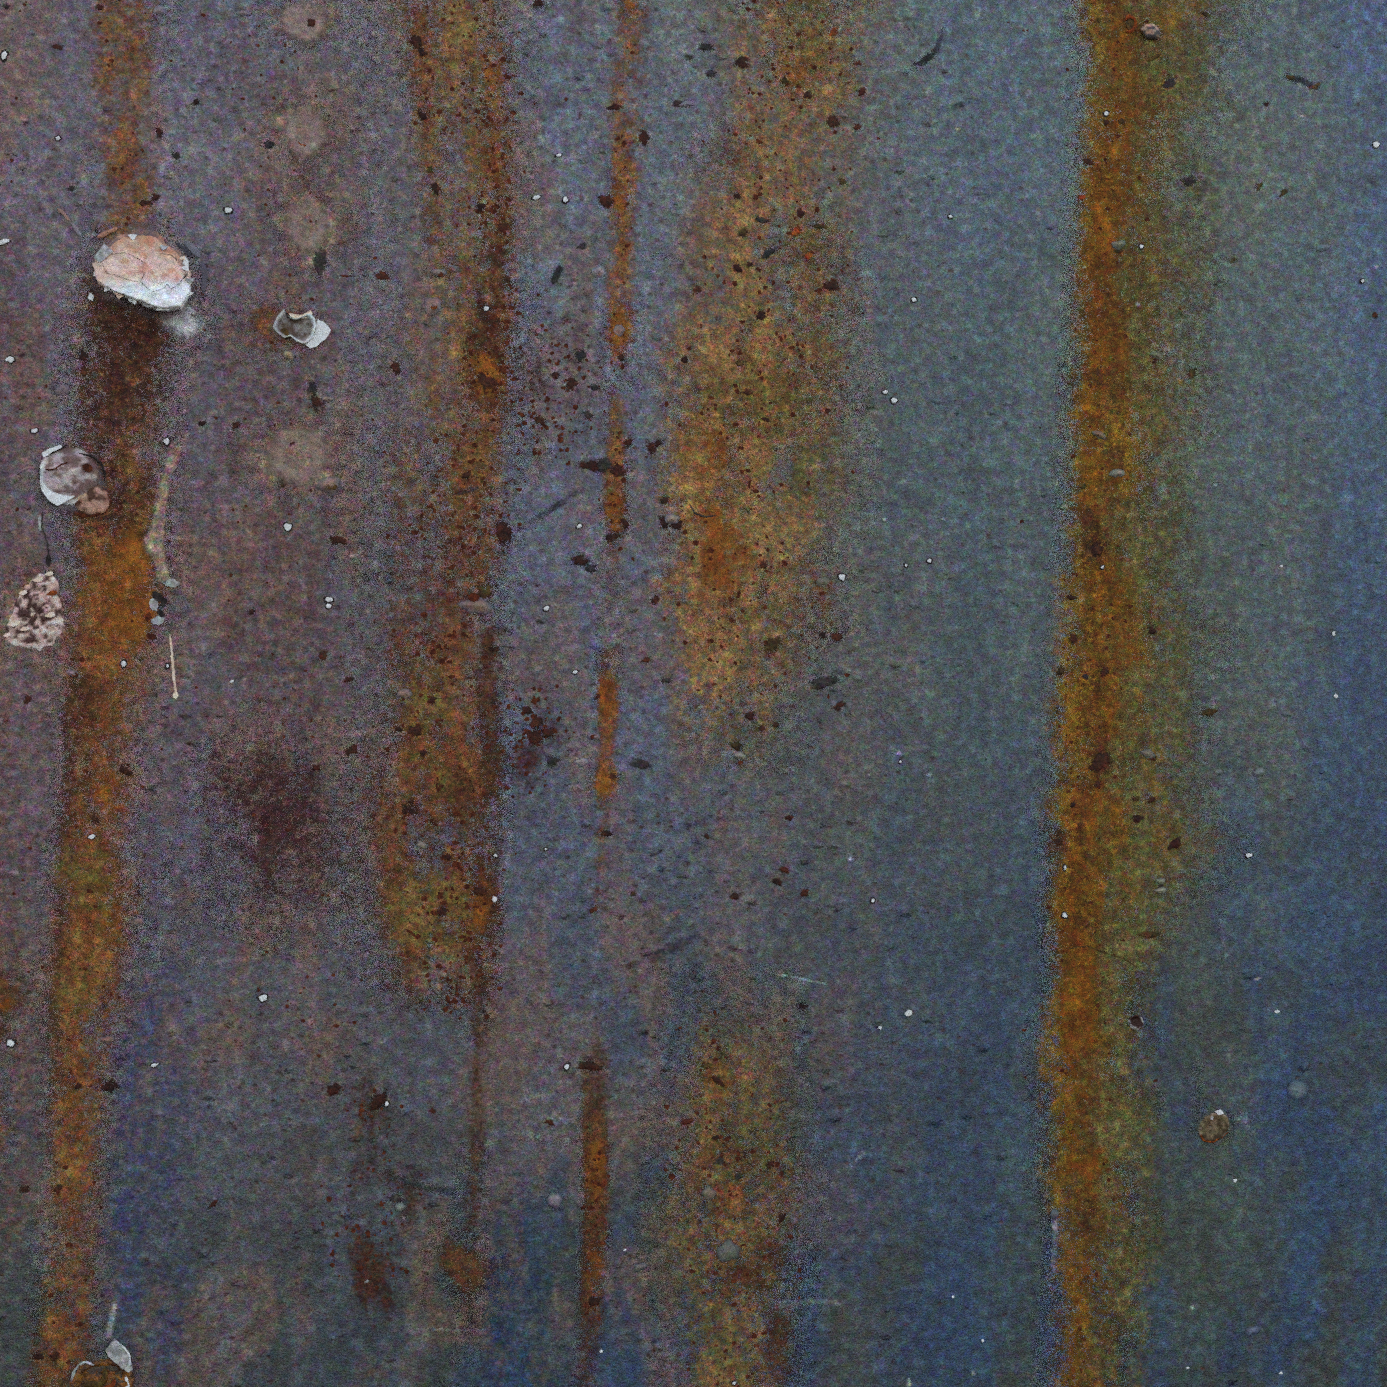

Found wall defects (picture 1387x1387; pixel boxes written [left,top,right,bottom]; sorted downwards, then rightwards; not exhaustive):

corrosion [93,0,156,243]
corrosion [230,13,315,117]
peeling [250,307,331,348]
corrosion [643,0,880,743]
peeling [1,571,65,652]
corrosion [0,299,182,1387]
corrosion [212,483,358,908]
corrosion [269,910,337,1057]
corrosion [366,0,645,1225]
corrosion [1022,0,1229,1387]
corrosion [580,1050,611,1387]
corrosion [655,1010,807,1387]